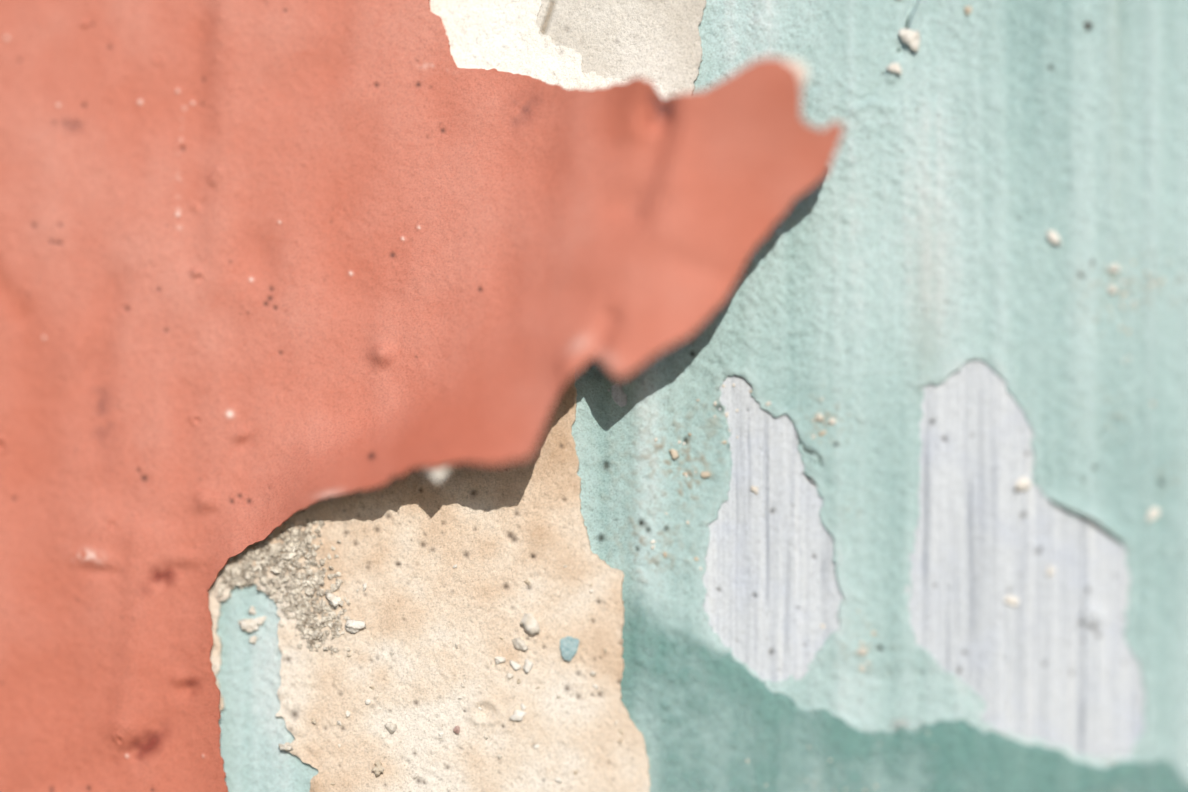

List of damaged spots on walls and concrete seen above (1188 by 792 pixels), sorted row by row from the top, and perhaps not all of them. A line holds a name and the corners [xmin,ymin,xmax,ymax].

peeling [203,0,844,792]
peeling [905,359,1146,761]